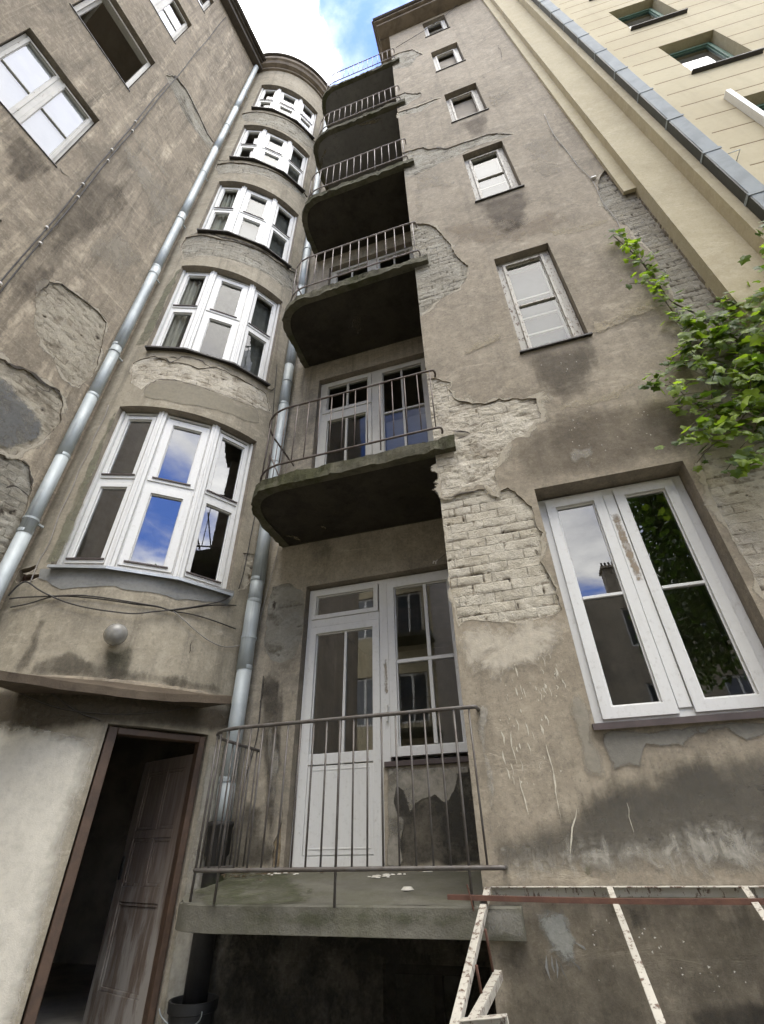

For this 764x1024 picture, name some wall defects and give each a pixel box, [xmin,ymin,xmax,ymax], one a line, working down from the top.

spalling [410,222,469,316]
spalling [597,170,759,395]
spalling [0,279,108,563]
spalling [129,355,272,414]
water stain [538,349,632,463]
spalling [426,369,562,626]
water stain [504,760,764,870]